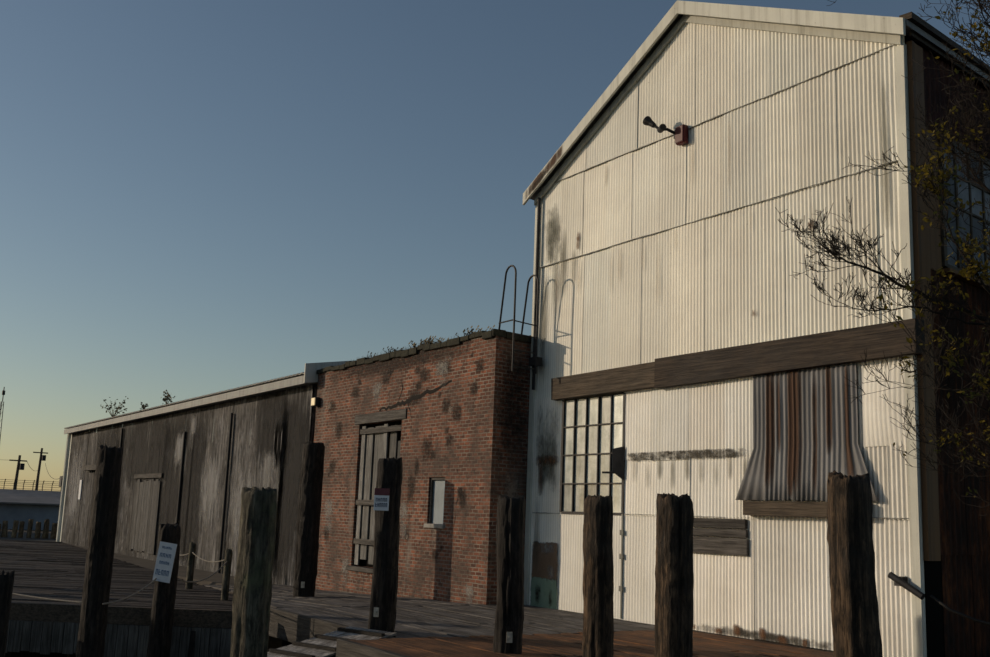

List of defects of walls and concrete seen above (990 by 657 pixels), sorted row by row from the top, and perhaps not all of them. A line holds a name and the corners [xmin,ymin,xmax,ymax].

damp [540,218,565,350]
crack [379,372,452,415]
rust [765,366,832,494]
rust [844,366,853,477]